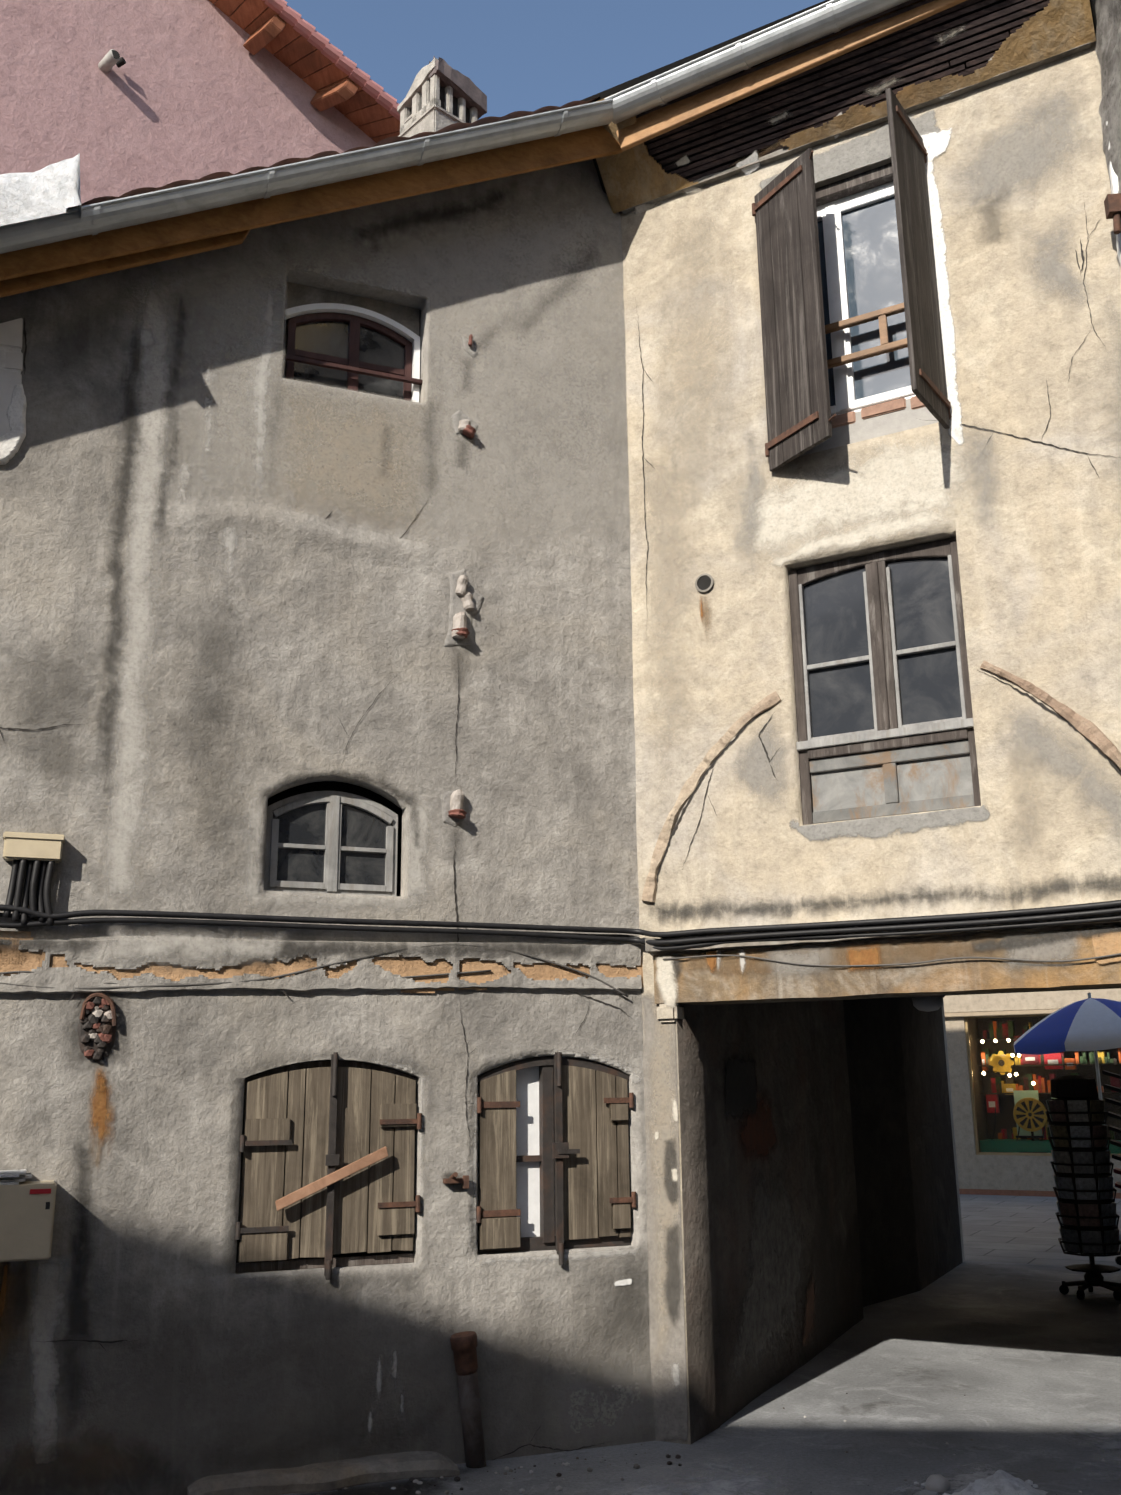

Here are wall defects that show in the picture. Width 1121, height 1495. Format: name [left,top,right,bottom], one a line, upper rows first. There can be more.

flaking render [635,204,656,214]
flaking render [736,152,760,176]
leakage [254,294,273,472]
crack [917,202,1117,477]
leakage [100,289,185,893]
crack [453,653,461,785]
crack [656,700,782,891]
crack [453,840,467,942]
rust [91,1070,112,1140]
flaking render [0,931,680,1330]
leakage [31,1147,90,1464]
leakage [301,1468,459,1495]